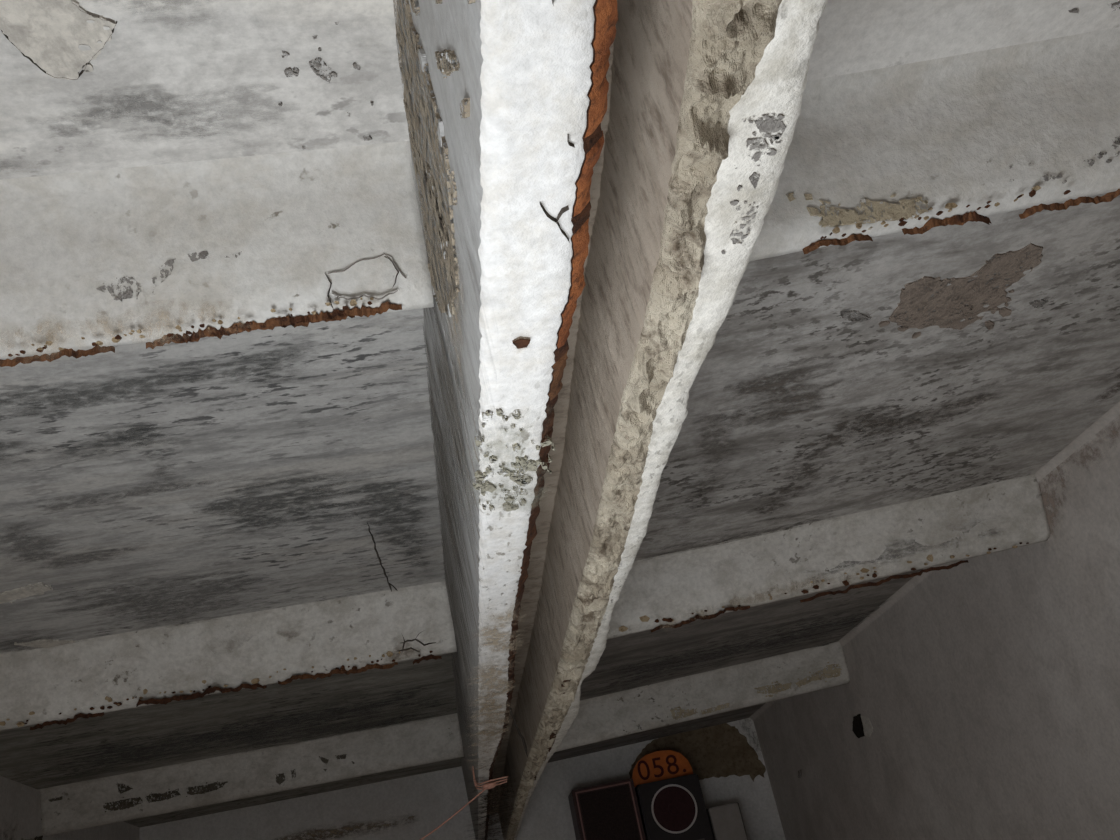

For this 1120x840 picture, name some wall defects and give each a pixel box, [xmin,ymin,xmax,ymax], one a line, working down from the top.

peeling [0,0,117,80]
peeling [393,0,460,317]
corrosion [802,234,873,254]
peeling [786,192,1000,240]
corrosion [902,211,991,235]
corrosion [1019,189,1120,219]
peeling [841,243,1043,339]
corrosion [0,297,402,367]
peeling [472,408,555,512]
crack [485,0,693,840]
spalling [505,0,787,840]
corrosion [136,662,398,707]